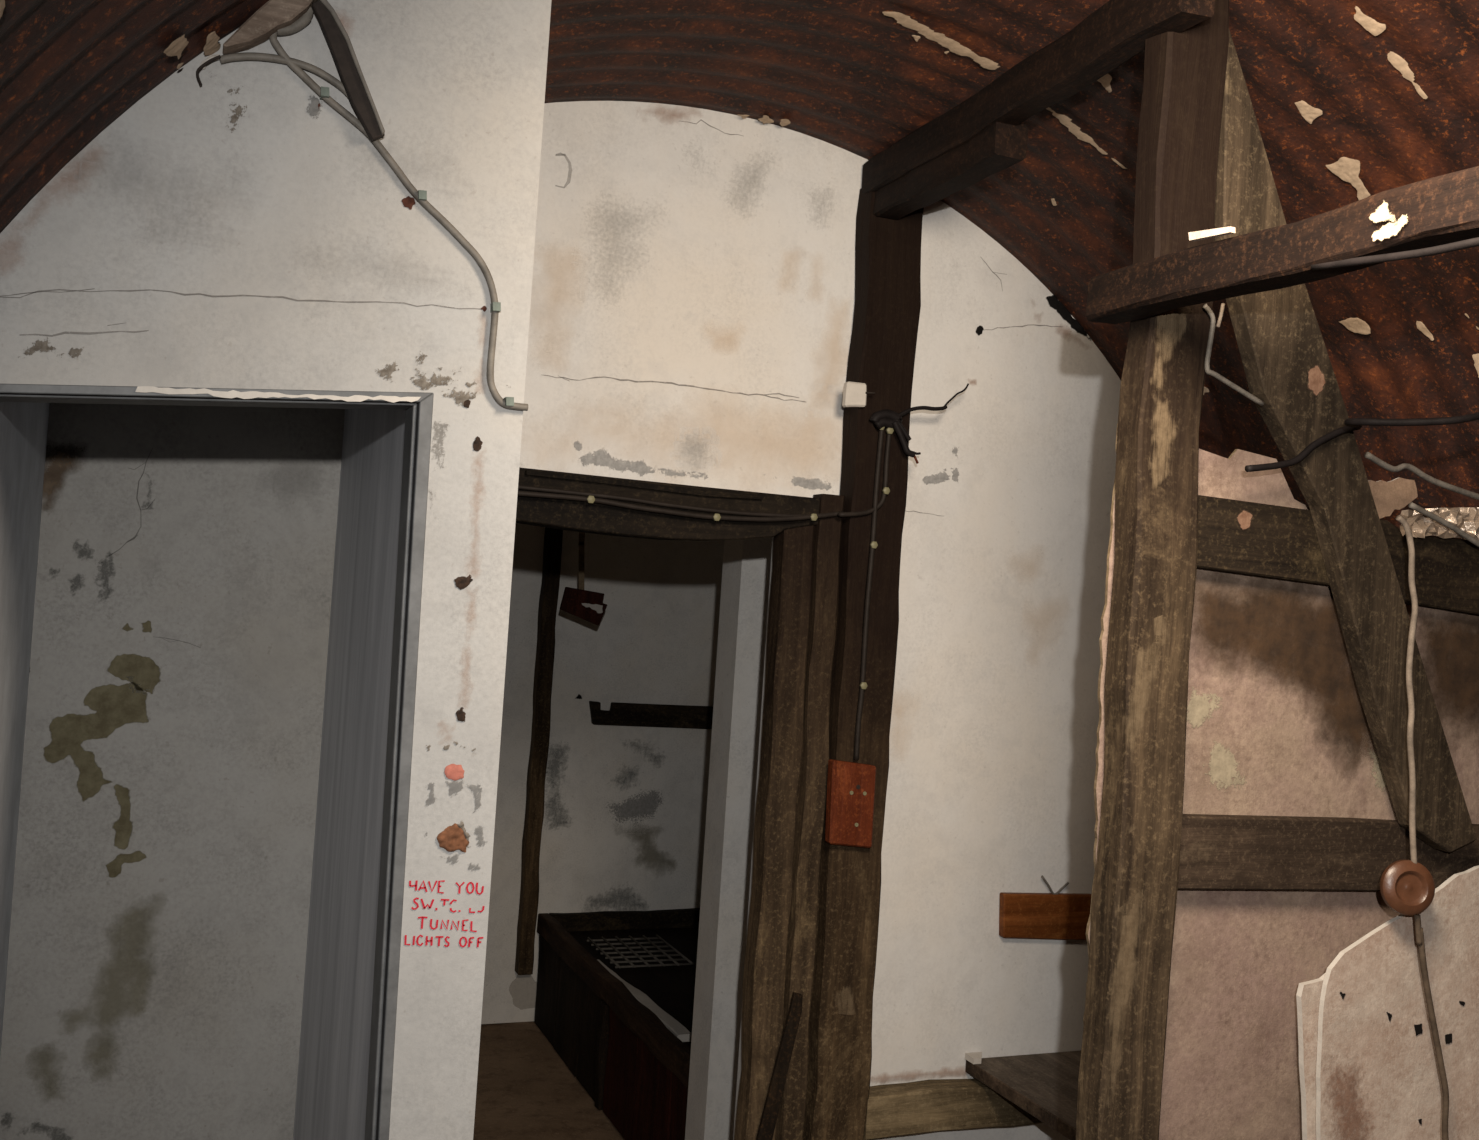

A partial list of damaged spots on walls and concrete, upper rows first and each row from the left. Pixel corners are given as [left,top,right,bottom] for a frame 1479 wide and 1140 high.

crack [0,288,480,337]
crack [544,375,805,402]
damp [1187,689,1222,728]
damp [1195,586,1387,791]
spalling [426,781,485,870]
damp [603,772,670,864]